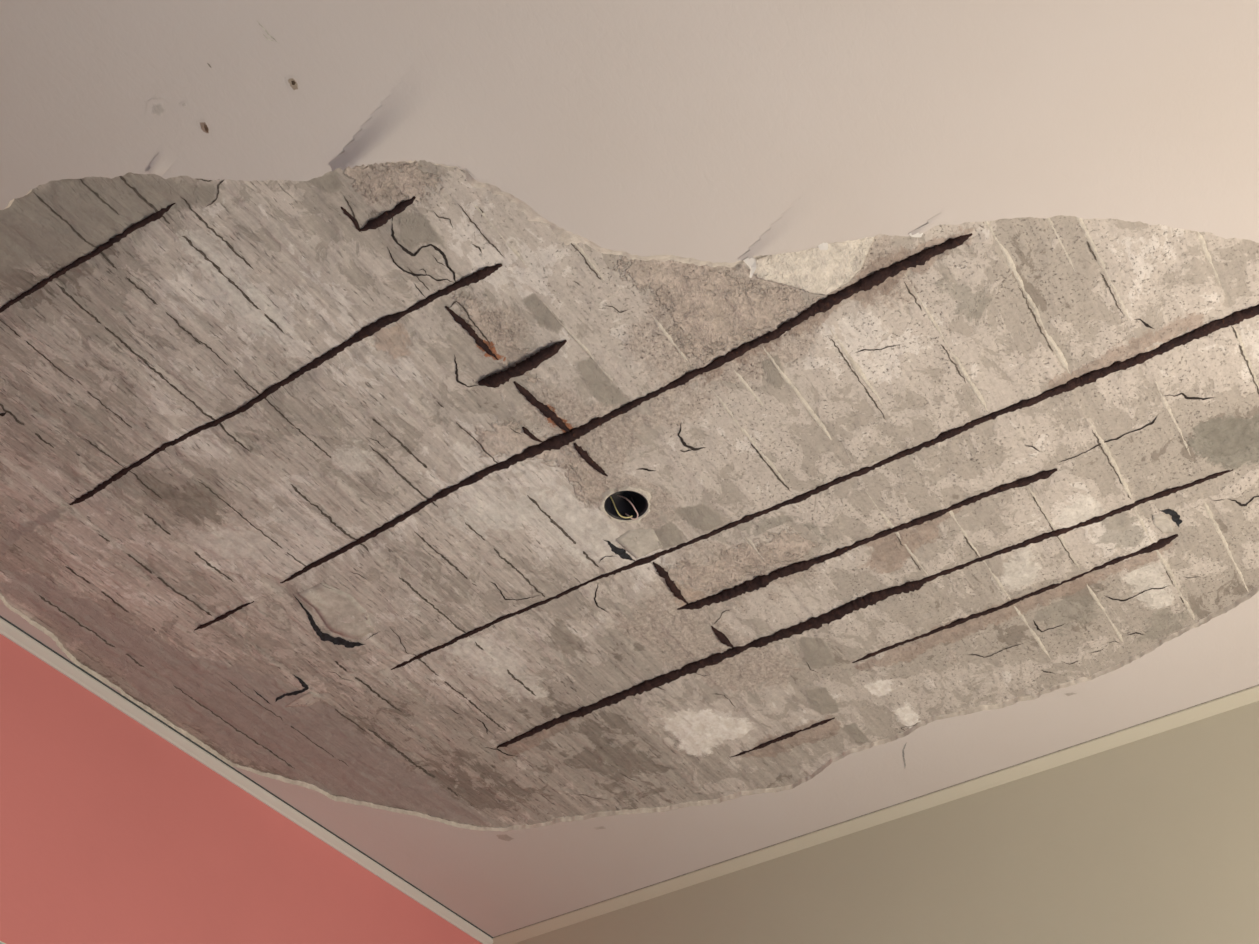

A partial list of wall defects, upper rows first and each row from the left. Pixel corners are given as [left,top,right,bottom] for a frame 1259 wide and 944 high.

flaking render [197,119,212,136]
crack [344,197,490,345]
corrosion [366,318,416,361]
corrosion [657,221,988,405]
crack [454,355,478,387]
corrosion [537,399,577,435]
spalling [0,160,1259,832]
corrosion [853,502,965,581]
corrosion [669,577,711,611]
corrosion [849,535,1179,672]
corrosion [492,706,590,764]
corrosion [734,713,846,764]